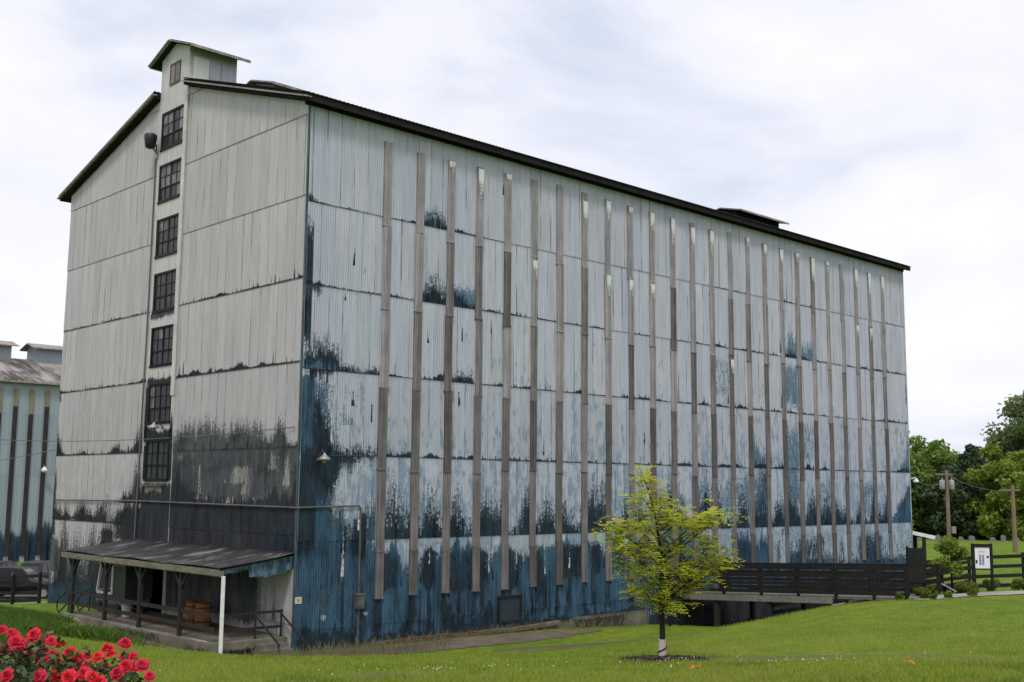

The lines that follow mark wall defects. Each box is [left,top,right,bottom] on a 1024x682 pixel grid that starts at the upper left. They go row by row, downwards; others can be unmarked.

damp [394,211,503,242]
damp [63,270,604,332]
damp [49,326,910,649]